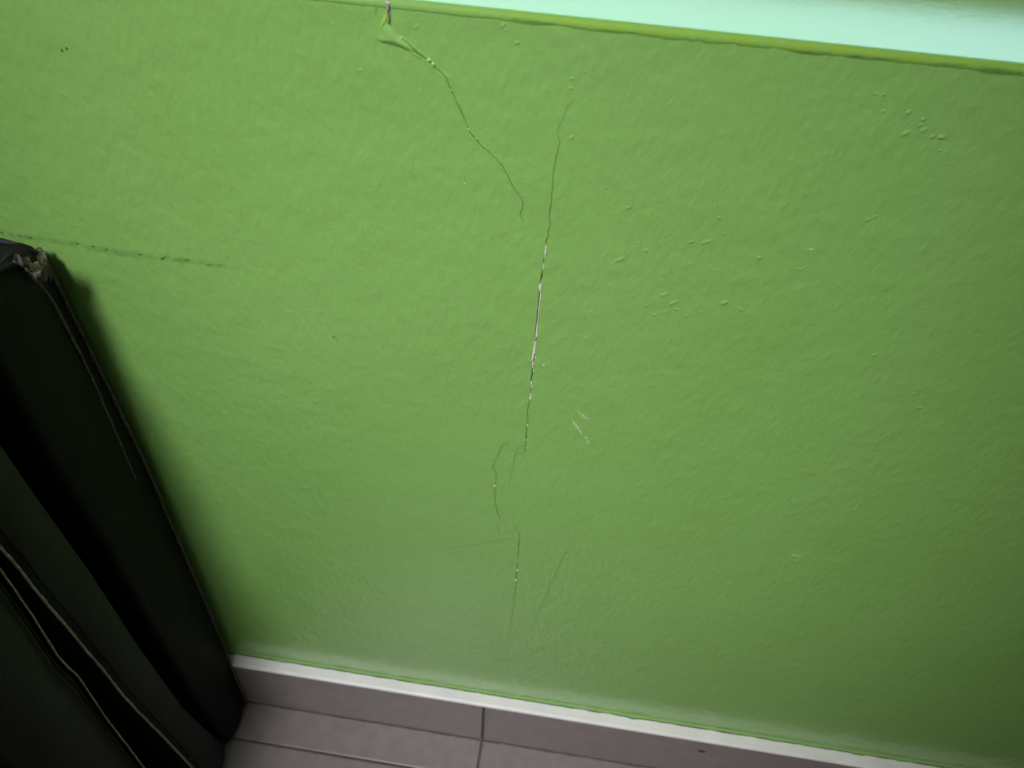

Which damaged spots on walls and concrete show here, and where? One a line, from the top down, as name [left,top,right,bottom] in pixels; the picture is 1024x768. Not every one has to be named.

crack [375,0,523,221]
crack [492,99,574,627]